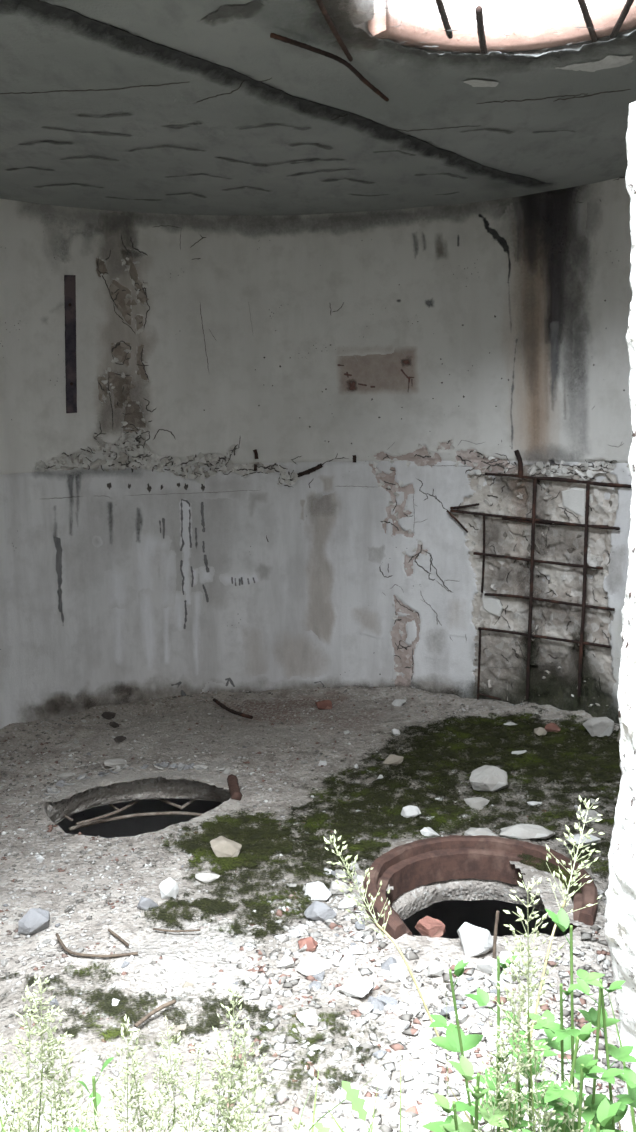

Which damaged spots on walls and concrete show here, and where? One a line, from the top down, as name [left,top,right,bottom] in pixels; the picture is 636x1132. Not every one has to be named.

crack [0,78,272,102]
leakage [86,185,606,460]
leakage [14,470,473,723]
spalling [351,439,636,745]
crack [379,440,627,679]
leakage [603,529,630,707]
leakage [0,707,622,1132]